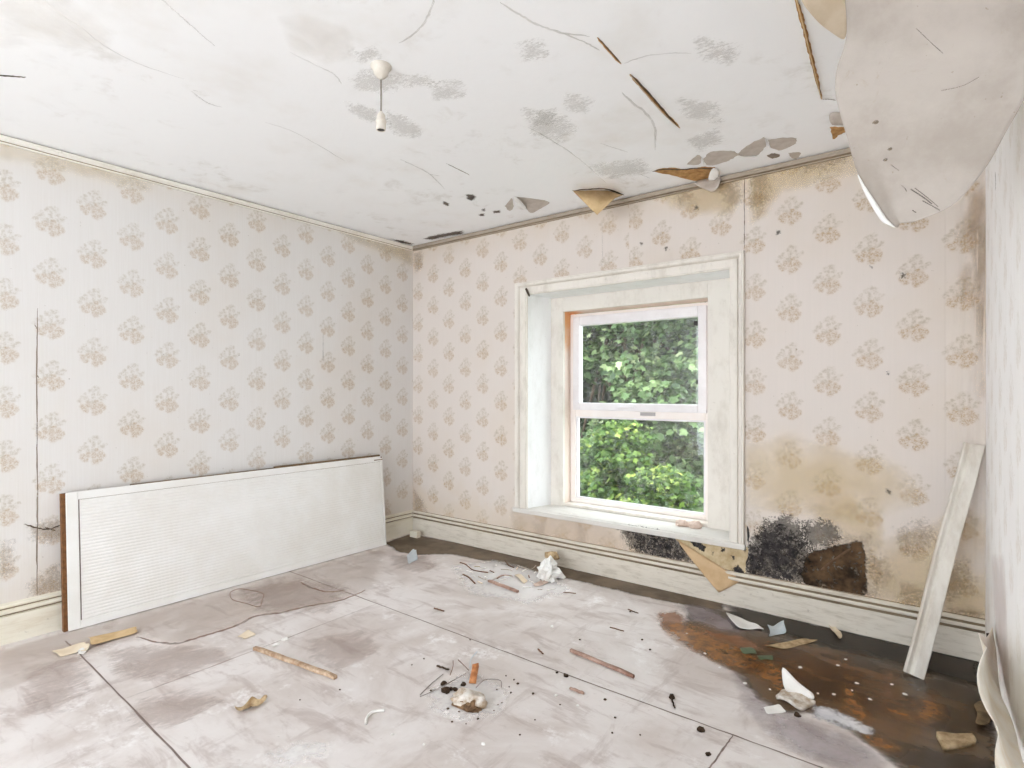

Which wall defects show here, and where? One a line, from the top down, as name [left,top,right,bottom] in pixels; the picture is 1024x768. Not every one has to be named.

peeling [652,137,801,192]
crack [25,308,60,590]
water stain [386,535,541,572]
water stain [616,512,867,595]
water stain [557,566,997,768]